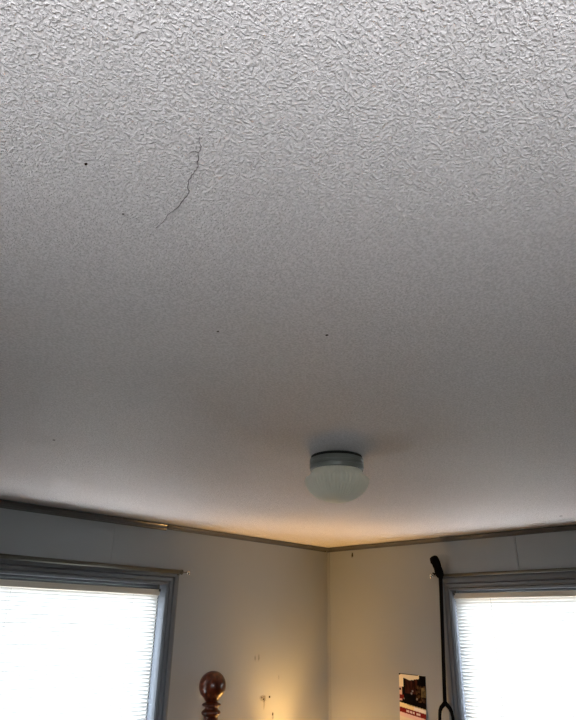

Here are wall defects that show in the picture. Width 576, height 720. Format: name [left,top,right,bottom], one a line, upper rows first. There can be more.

crack [156,137,201,228]